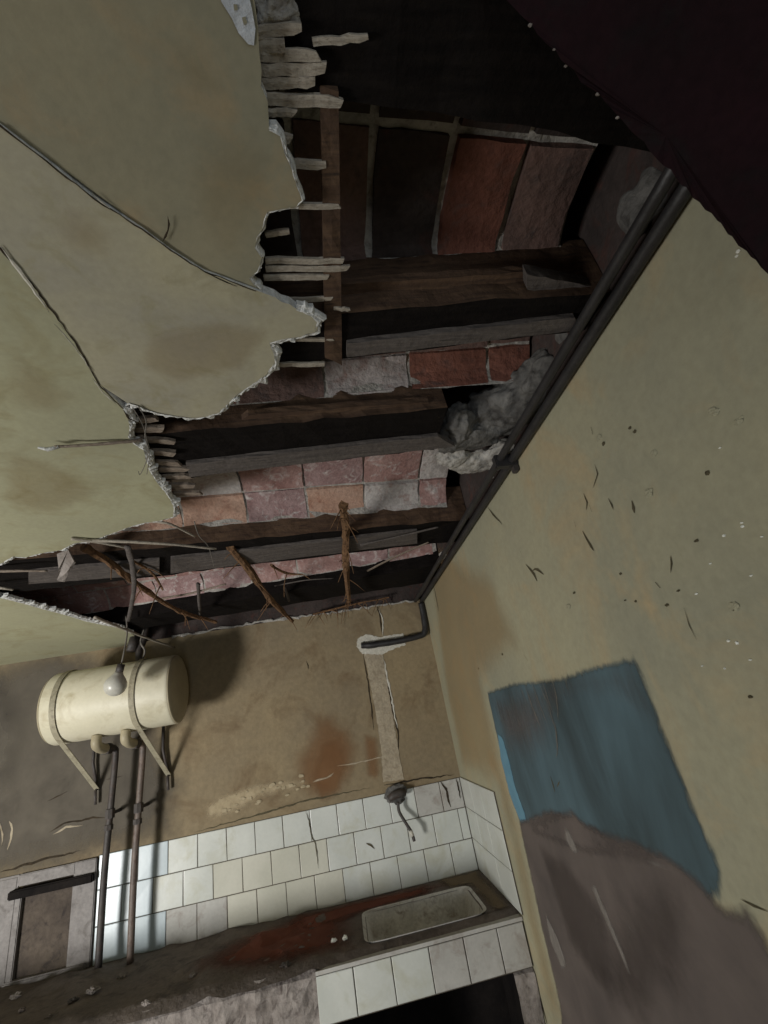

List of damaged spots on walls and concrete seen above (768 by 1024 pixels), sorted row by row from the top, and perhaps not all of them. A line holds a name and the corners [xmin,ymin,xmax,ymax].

peeling [221,0,255,45]
crack [0,125,256,291]
flaking render [249,119,305,290]
crack [0,246,140,424]
flaking render [0,300,327,565]
flaking render [0,593,134,634]
flaking render [172,600,414,639]
crack [376,607,384,633]
crack [52,816,105,834]
rust [307,731,348,793]
crack [314,656,399,782]
flaking render [520,811,768,1024]